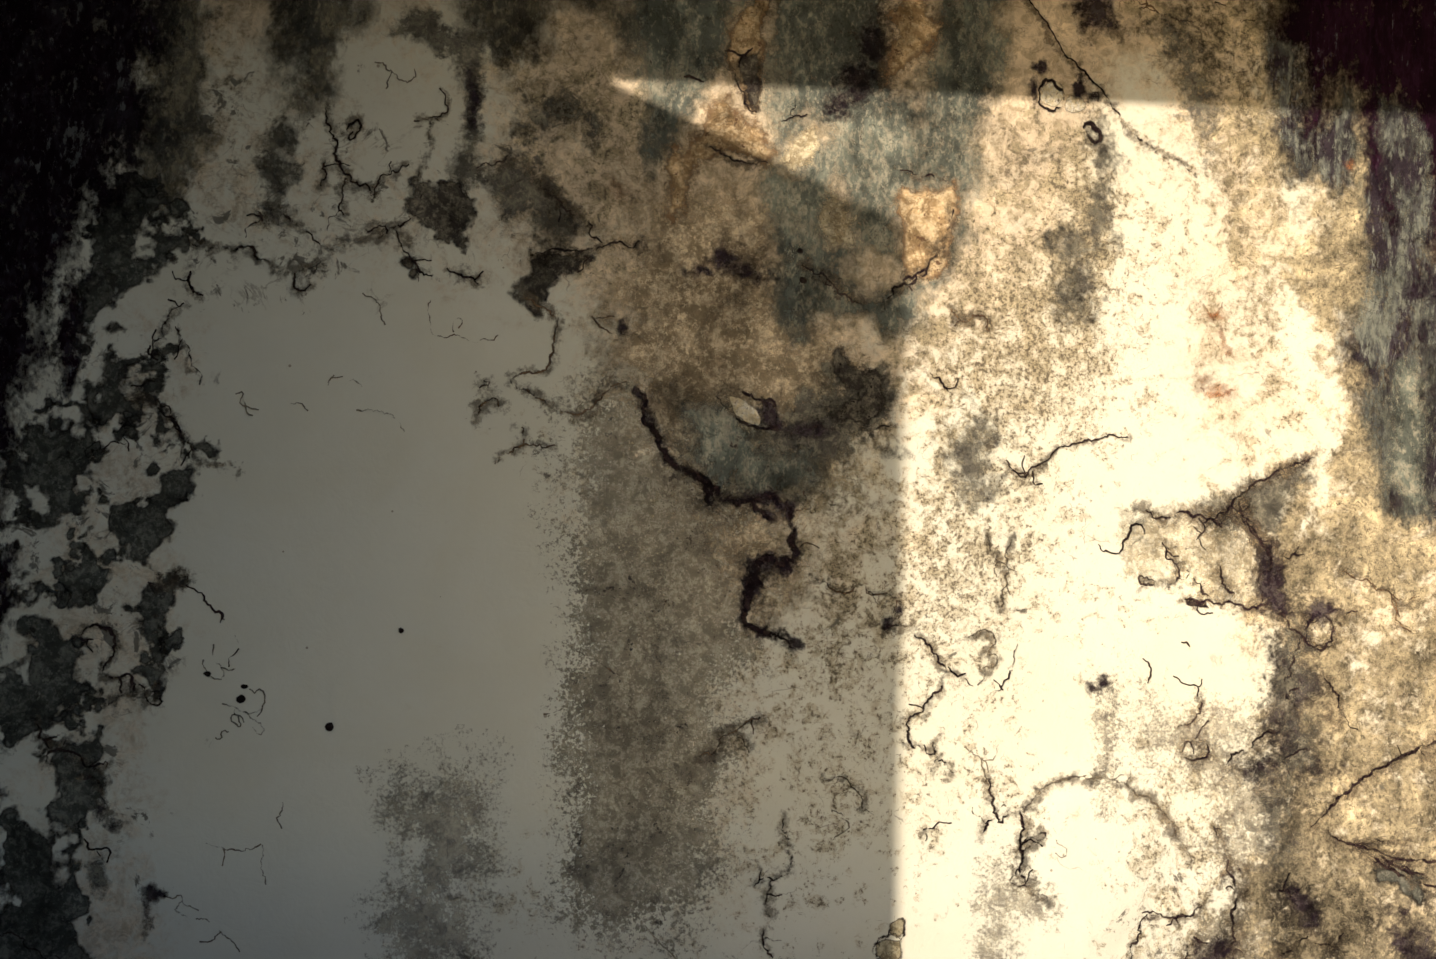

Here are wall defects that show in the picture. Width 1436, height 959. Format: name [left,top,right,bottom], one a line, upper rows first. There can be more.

water stain [0,0,218,654]
peeling [0,172,220,959]
crack [102,62,498,476]
water stain [363,749,503,959]
water stain [458,0,1012,959]
peeling [664,0,945,225]
peeling [872,918,906,959]
crack [472,155,1345,959]
peeling [895,179,961,280]
crack [1098,451,1419,773]
water stain [1243,0,1436,530]
crack [1309,735,1436,890]